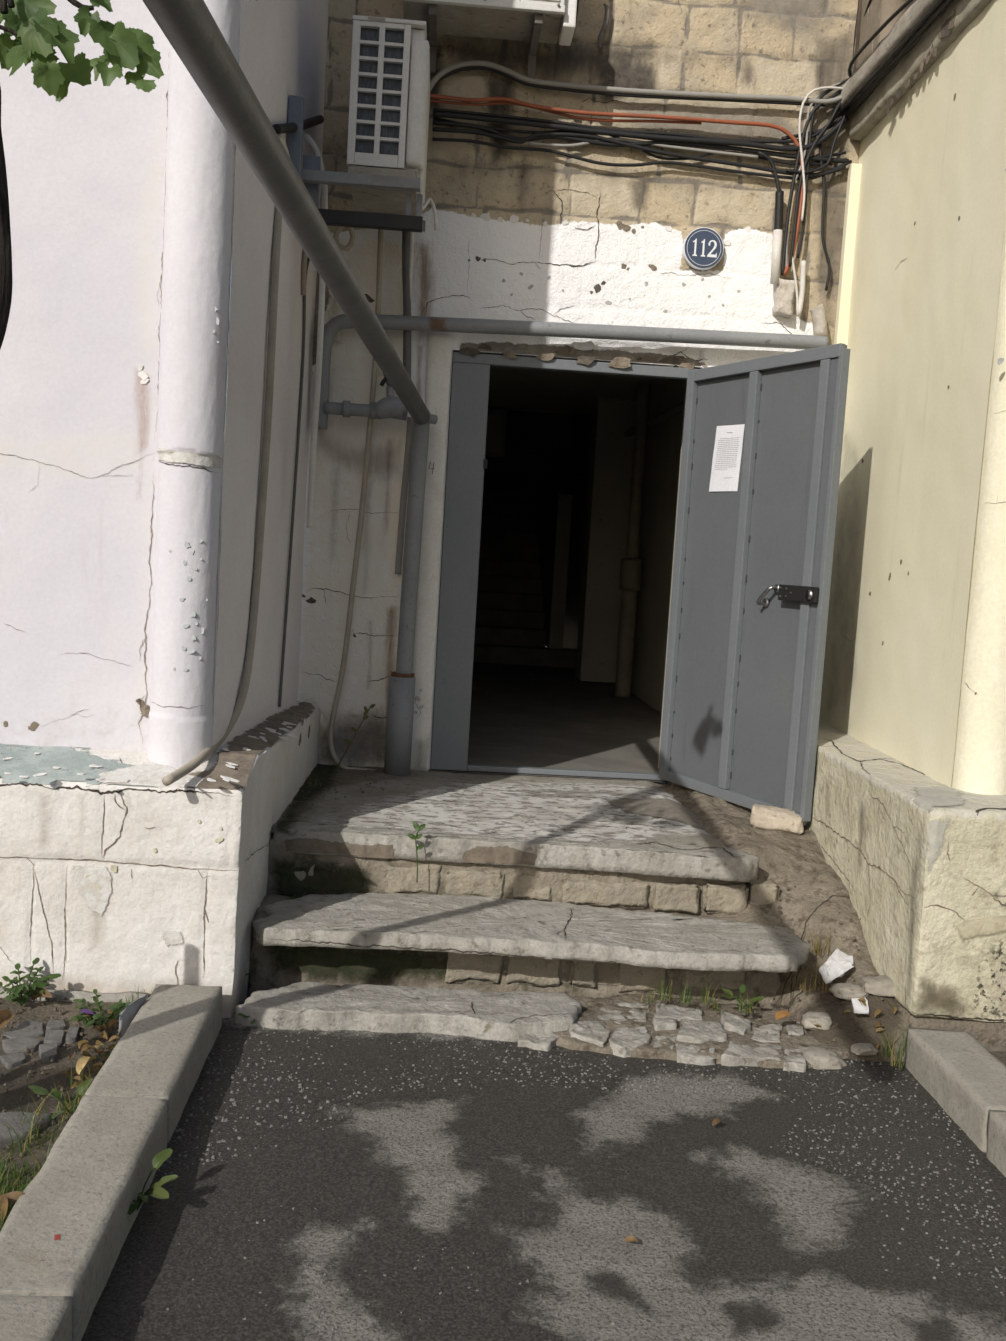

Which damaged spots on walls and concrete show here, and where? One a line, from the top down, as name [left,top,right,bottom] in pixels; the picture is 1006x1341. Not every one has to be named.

crack [424,189,601,322]
spalling [459,339,708,370]
crack [0,91,270,985]
flaking render [136,699,150,717]
peeling [0,702,315,798]
crack [770,738,1006,1012]
crack [905,987,1006,1022]